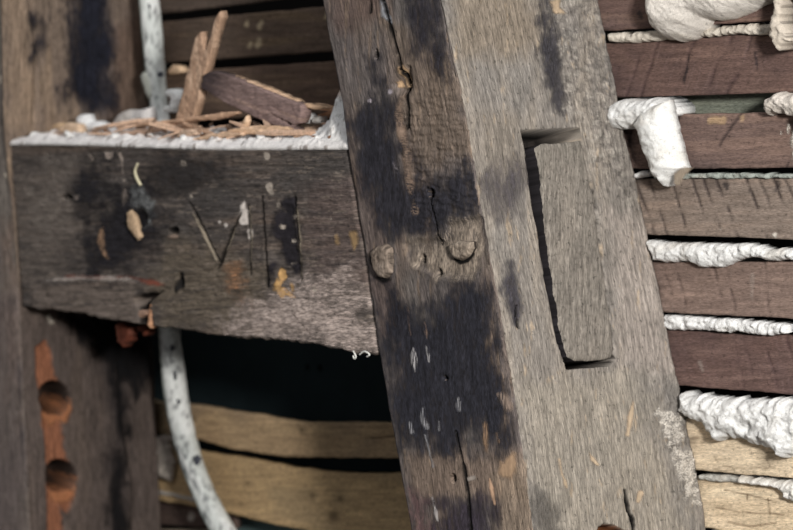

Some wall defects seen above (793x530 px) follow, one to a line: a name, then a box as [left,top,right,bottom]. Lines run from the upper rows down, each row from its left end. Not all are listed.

leakage [29,12,45,62]
leakage [56,0,120,114]
crack [370,0,412,129]
leakage [345,56,480,242]
leakage [269,196,302,275]
leakage [232,261,521,477]
crack [455,430,473,530]